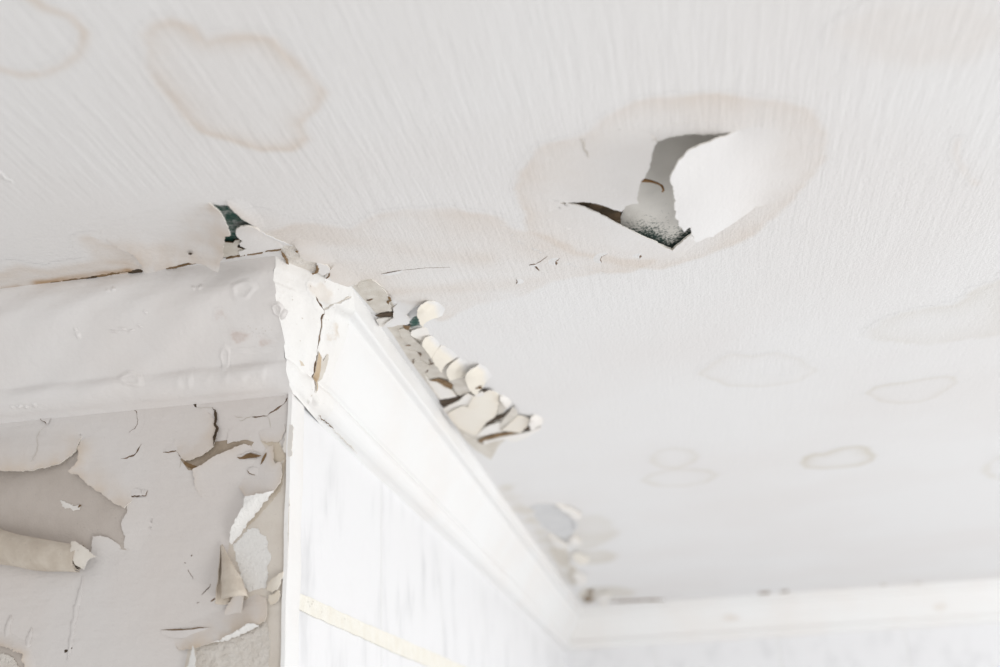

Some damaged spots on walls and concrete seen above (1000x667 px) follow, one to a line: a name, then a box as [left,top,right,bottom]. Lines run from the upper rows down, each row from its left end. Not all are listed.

water stain [132,11,336,156]
water stain [233,89,836,324]
peeling [0,632,36,667]
peeling [0,421,153,572]
peeling [172,420,294,667]
crack [122,279,356,505]
peeling [90,197,543,459]
water stain [796,444,882,470]